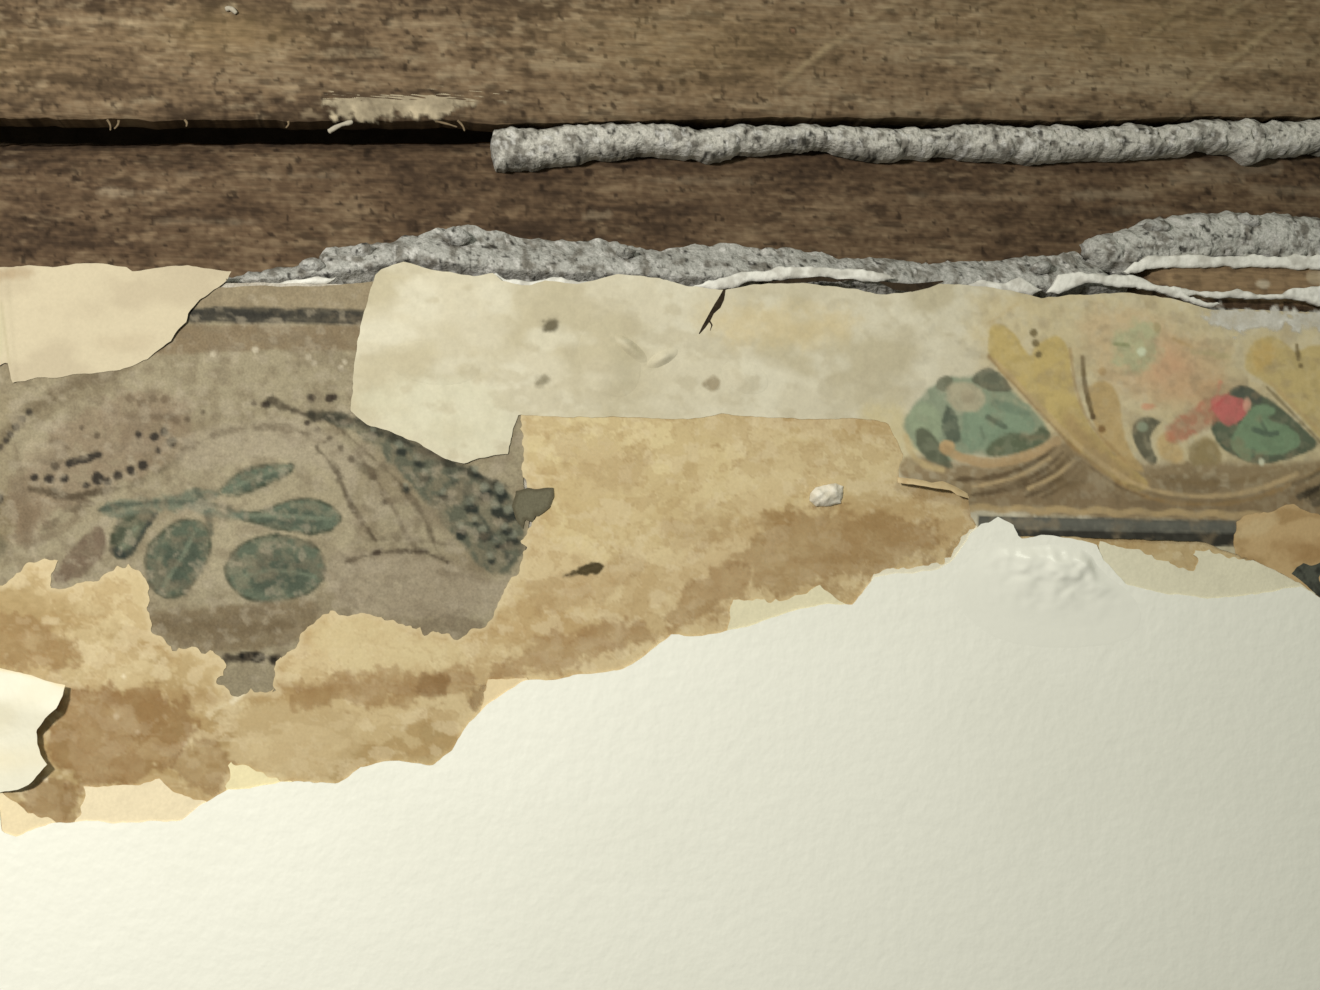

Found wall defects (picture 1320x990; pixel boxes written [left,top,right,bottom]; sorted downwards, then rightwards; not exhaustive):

spalling [225,210,1320,308]
crack [699,289,725,334]
damp [566,563,603,576]
peeling [1233,504,1320,597]
peeling [0,668,65,792]